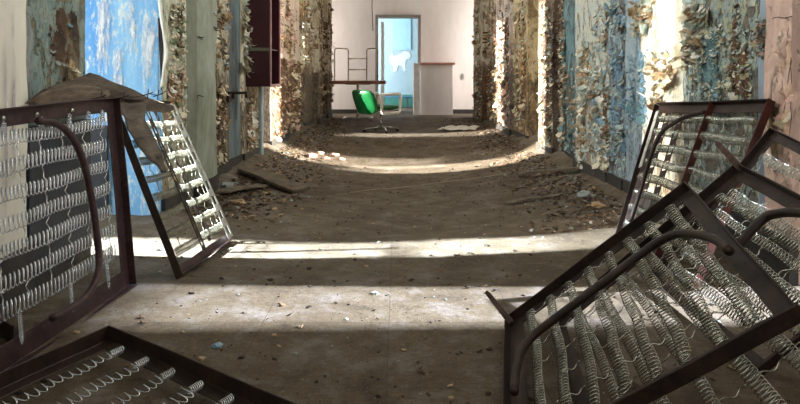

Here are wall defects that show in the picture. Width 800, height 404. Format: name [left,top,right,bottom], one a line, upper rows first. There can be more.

peeling [49,8,81,81]
peeling [158,0,189,133]
peeling [213,0,233,70]
peeling [216,81,232,168]
peeling [242,0,255,77]
peeling [246,88,261,151]
spalling [271,0,335,142]
spalling [471,0,527,134]
spalling [536,0,794,175]